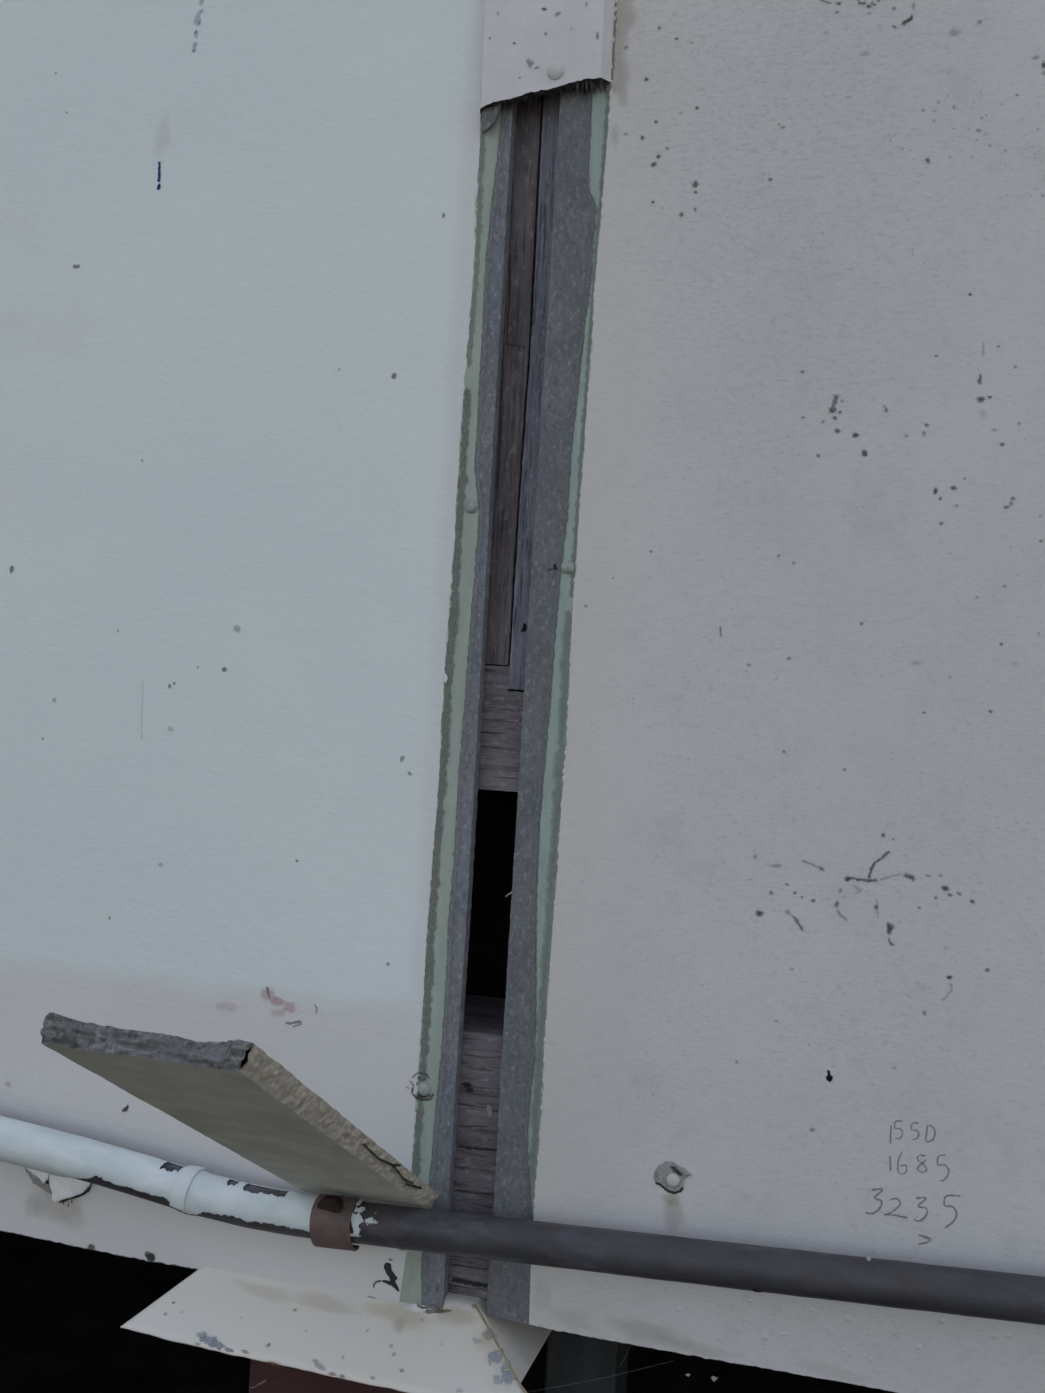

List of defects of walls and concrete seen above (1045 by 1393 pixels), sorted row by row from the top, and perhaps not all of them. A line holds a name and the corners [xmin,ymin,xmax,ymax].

peeling [25,1167,94,1207]